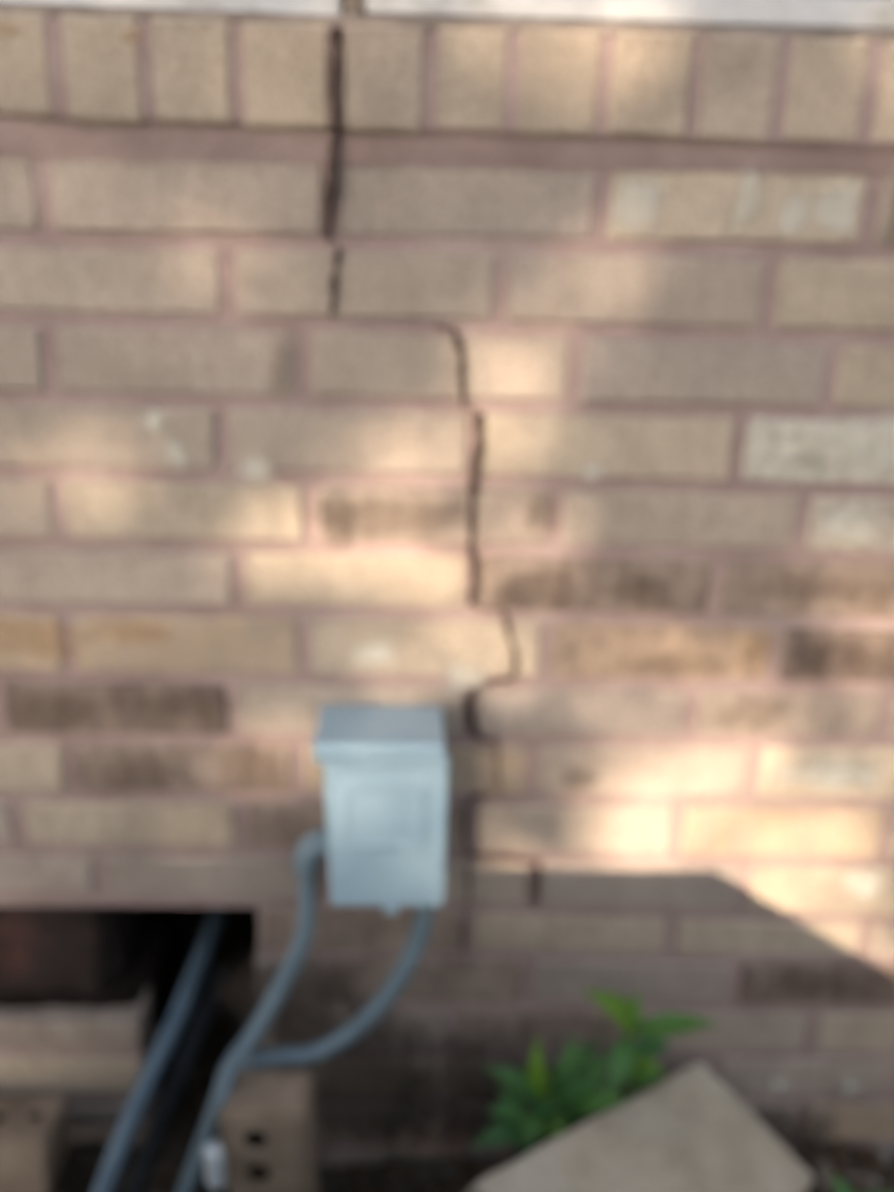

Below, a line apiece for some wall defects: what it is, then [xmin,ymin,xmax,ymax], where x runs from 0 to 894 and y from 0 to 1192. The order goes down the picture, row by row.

crack [325,27,342,318]
crack [434,326,519,743]
crack [532,859,540,908]